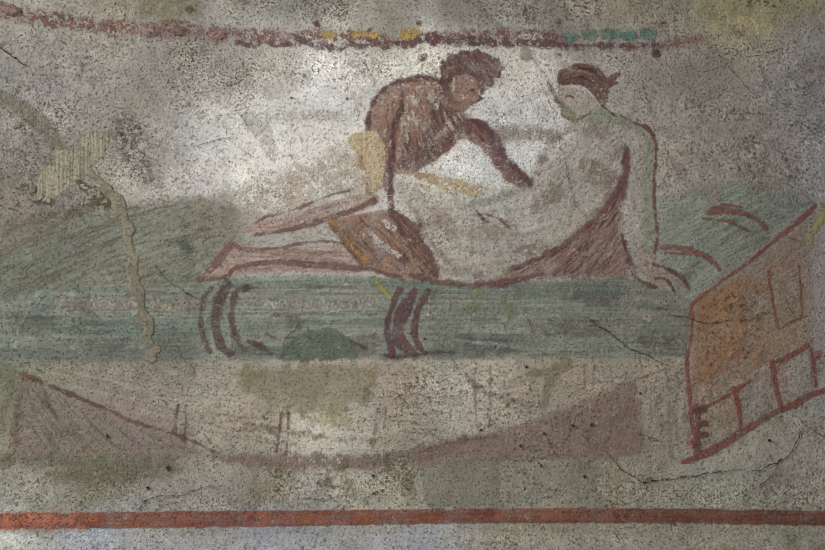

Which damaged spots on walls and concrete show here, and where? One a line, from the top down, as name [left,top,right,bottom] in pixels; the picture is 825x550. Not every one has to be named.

crack [590,319,671,366]
crack [666,312,766,343]
crack [550,417,824,486]